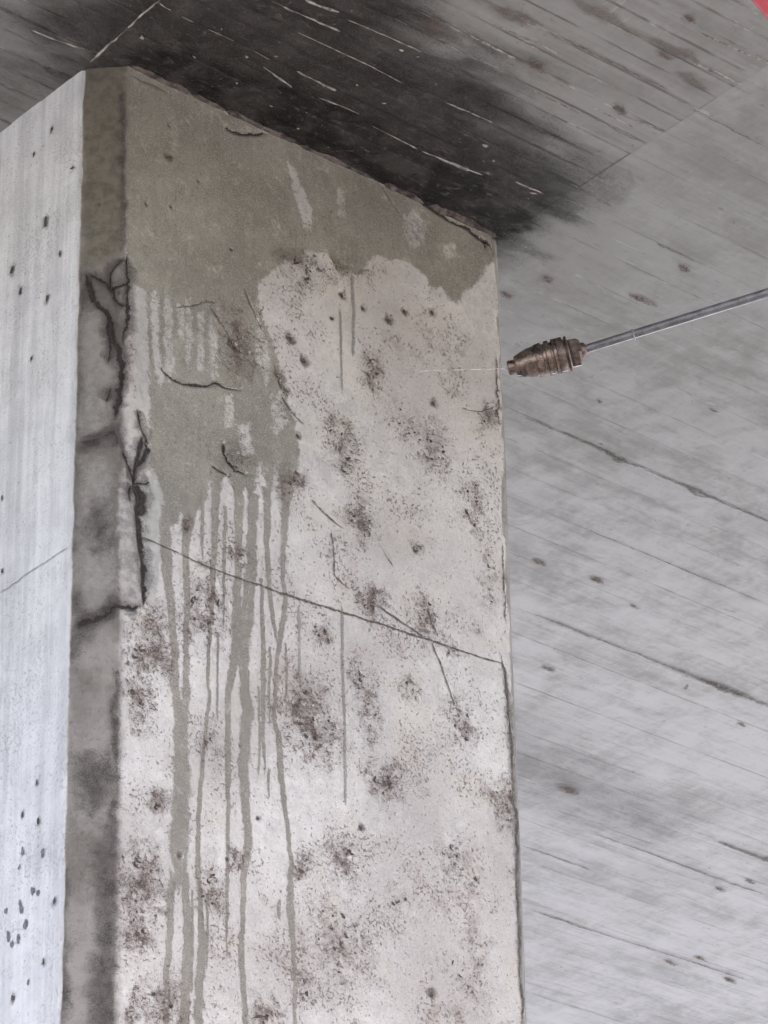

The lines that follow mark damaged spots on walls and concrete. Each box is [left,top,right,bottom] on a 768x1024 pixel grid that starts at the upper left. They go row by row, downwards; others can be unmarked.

crack [0,549,65,593]
leakage [0,0,608,1024]
crack [78,256,768,1023]